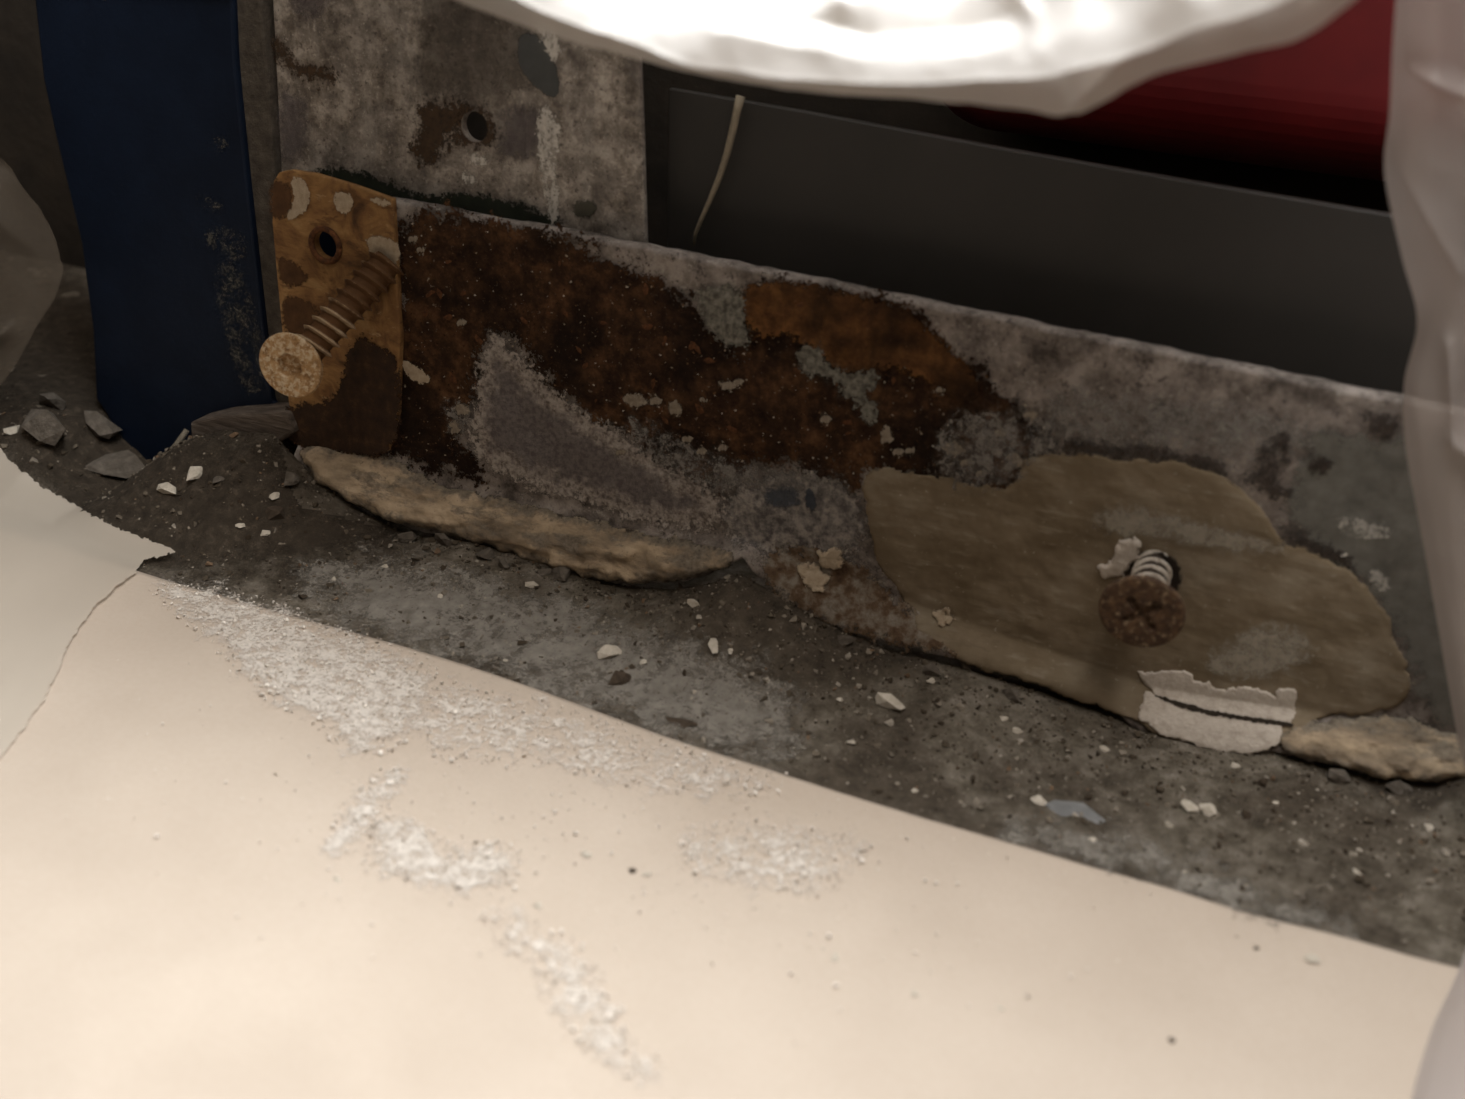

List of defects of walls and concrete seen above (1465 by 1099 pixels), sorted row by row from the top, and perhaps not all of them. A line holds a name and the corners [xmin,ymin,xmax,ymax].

corrosion [268,178,292,220]
corrosion [278,257,320,335]
corrosion [285,196,1455,729]
peeling [862,452,1410,755]